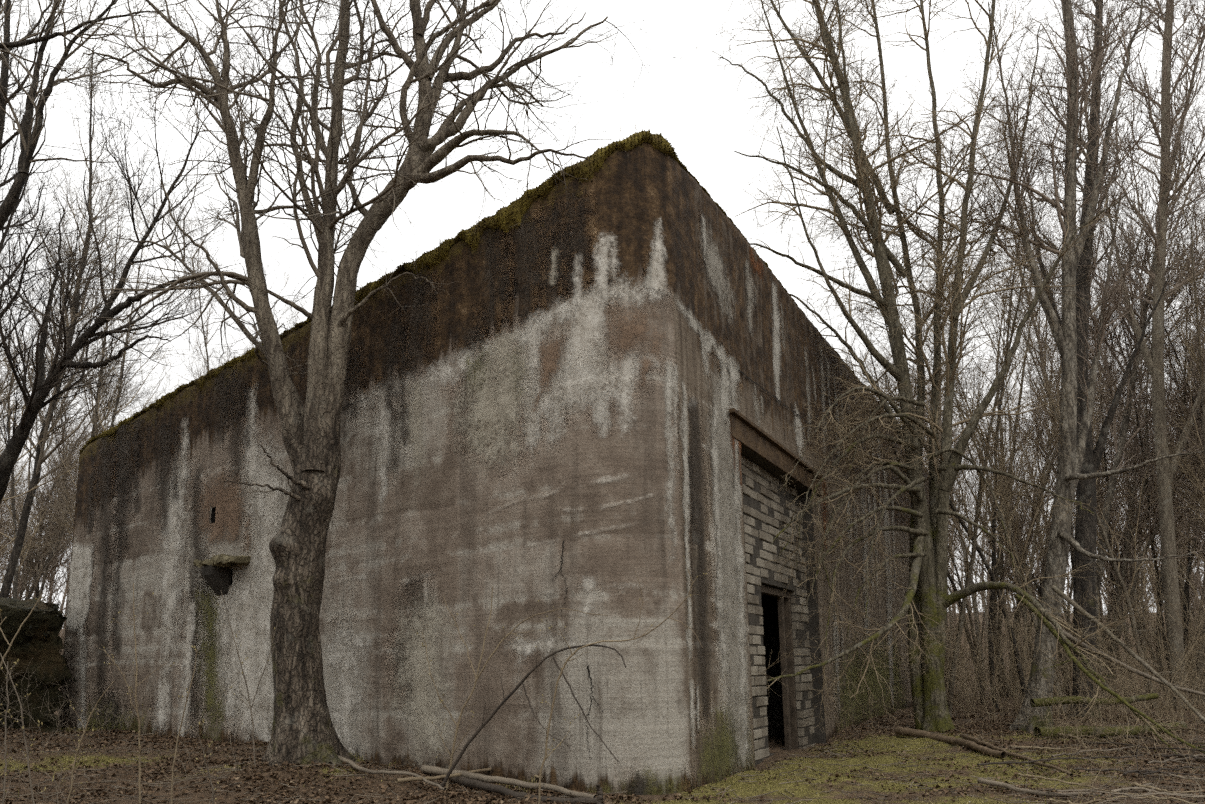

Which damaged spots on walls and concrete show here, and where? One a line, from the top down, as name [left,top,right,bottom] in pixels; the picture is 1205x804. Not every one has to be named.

damp [156,376,287,742]
damp [342,215,750,766]
damp [746,261,756,330]
damp [772,283,784,400]